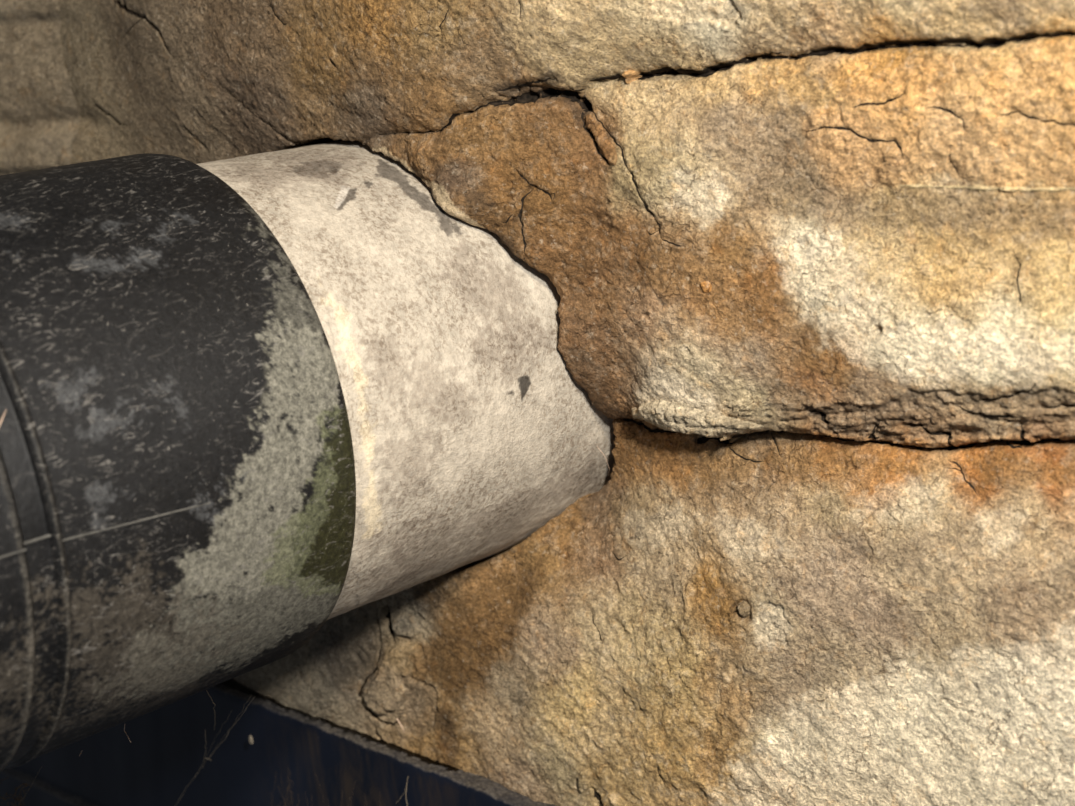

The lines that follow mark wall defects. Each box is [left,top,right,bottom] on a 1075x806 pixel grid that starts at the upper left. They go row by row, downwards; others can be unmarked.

crack [380,32,1075,254]
crack [358,607,425,740]
water stain [571,459,1075,806]